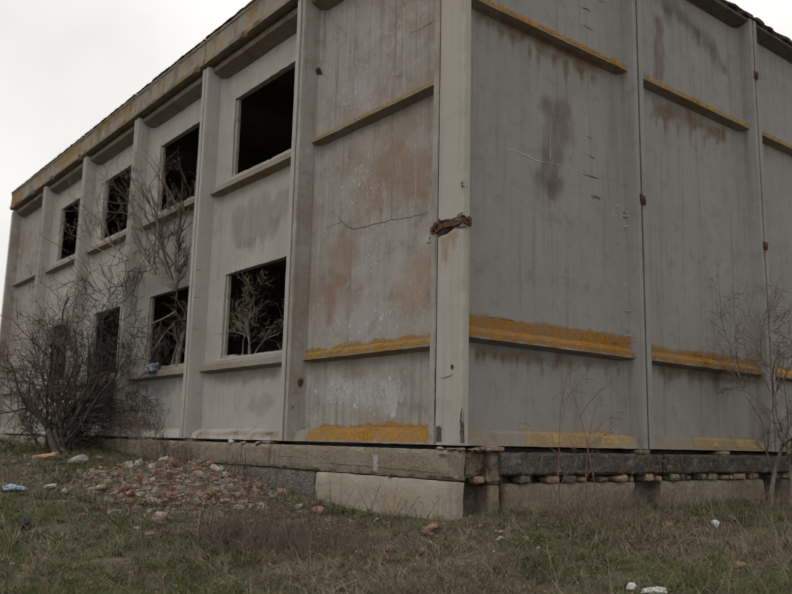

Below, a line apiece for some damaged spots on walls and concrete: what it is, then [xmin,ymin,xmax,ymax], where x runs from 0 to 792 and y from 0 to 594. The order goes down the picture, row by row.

crack [327,211,432,229]